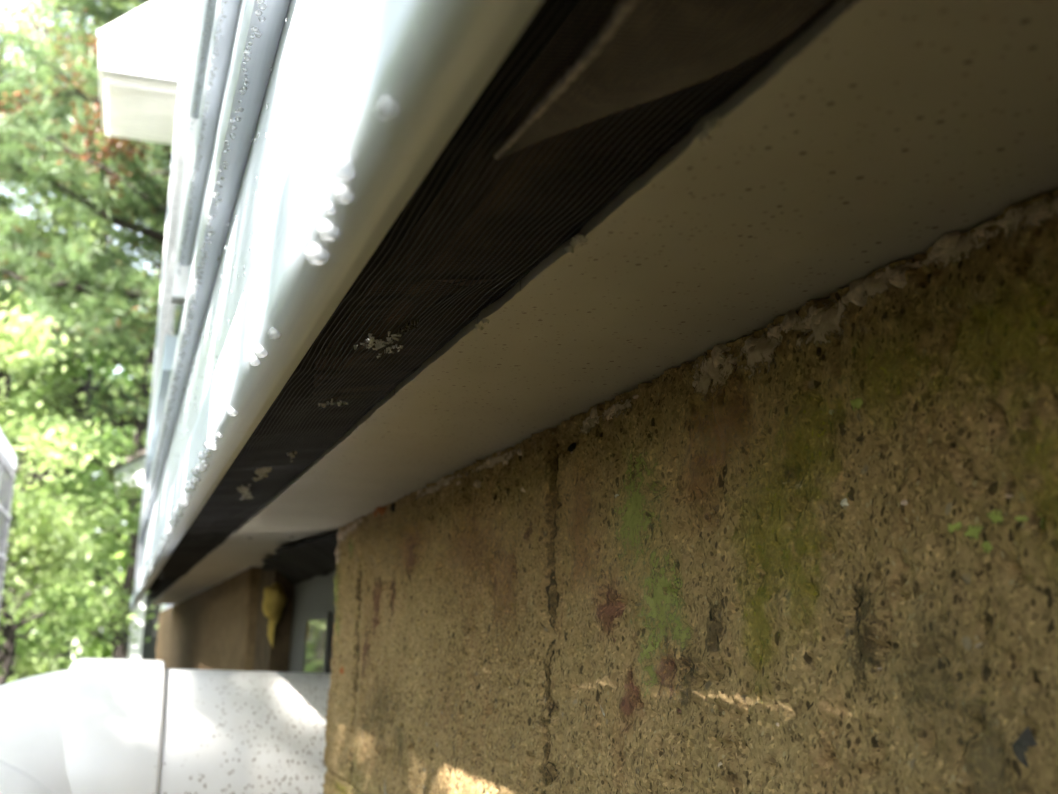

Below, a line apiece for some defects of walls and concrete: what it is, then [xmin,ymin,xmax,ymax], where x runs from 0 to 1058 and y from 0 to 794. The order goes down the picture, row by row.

crack [333,559,363,794]
crack [539,444,562,794]
leakage [666,574,726,721]
leakage [844,573,880,699]